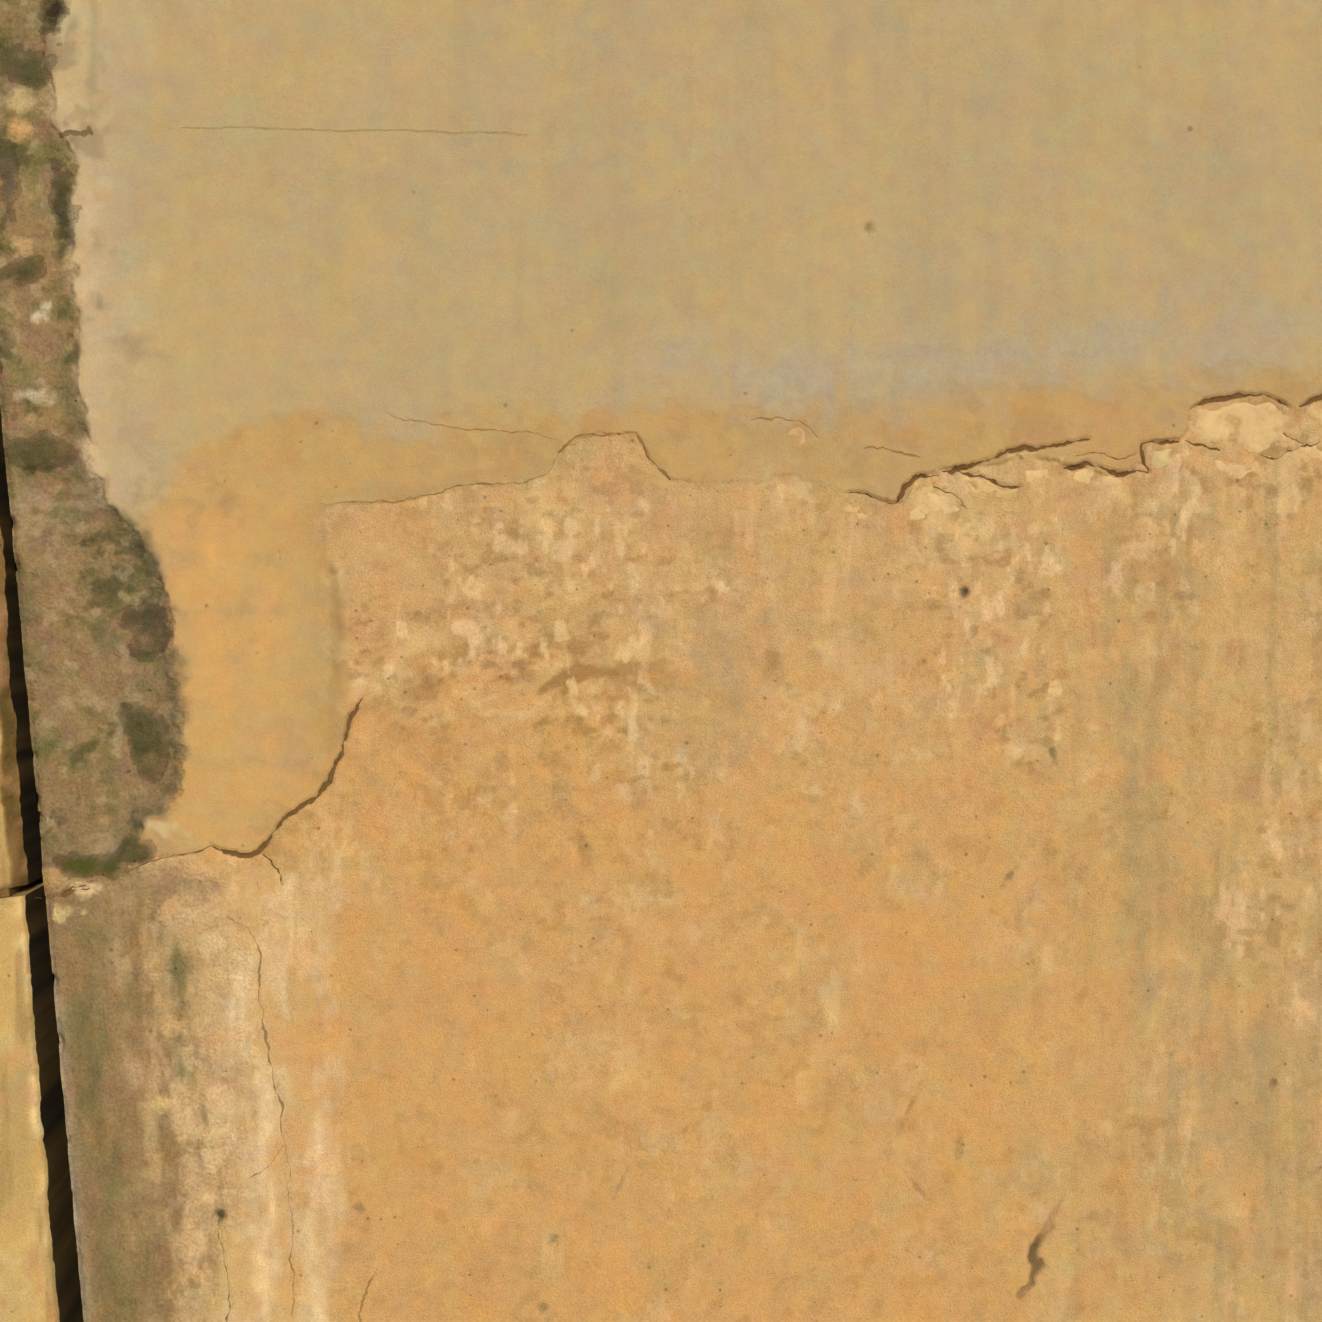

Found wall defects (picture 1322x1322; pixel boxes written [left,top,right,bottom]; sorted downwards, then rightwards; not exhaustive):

peeling [910,450,1066,520]
peeling [1074,468,1122,485]
peeling [1152,449,1177,468]
peeling [1190,402,1322,479]
spalling [957,583,973,602]
crack [130,698,363,885]
crack [47,883,95,899]
spalling [1015,1194,1065,1302]